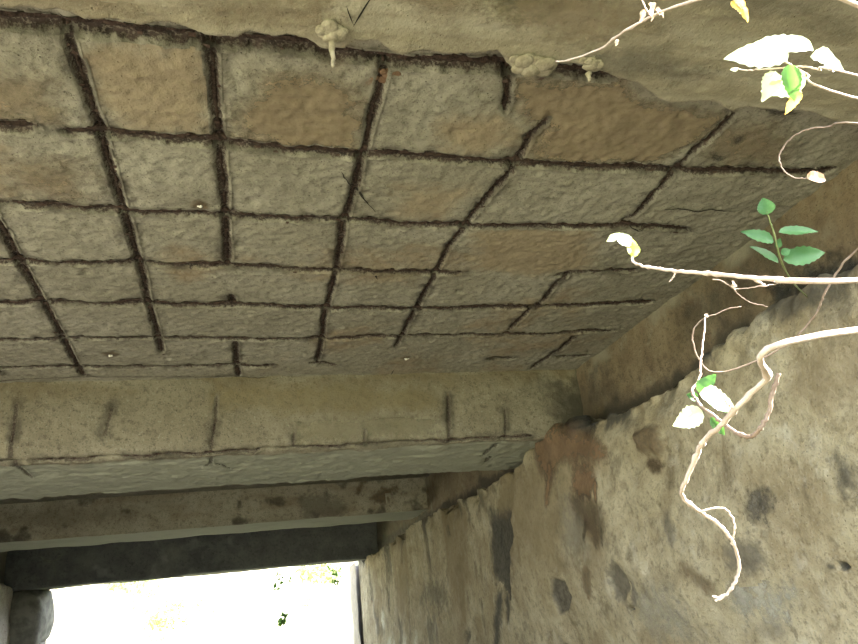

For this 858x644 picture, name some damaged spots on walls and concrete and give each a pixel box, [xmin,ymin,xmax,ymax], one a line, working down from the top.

rust [48,35,84,110]
rust [79,41,209,148]
rust [221,53,363,149]
rust [417,78,721,163]
spalling [0,8,840,378]
rust [374,176,609,281]
rust [535,423,609,506]
damp [485,494,519,644]
damp [718,488,797,644]